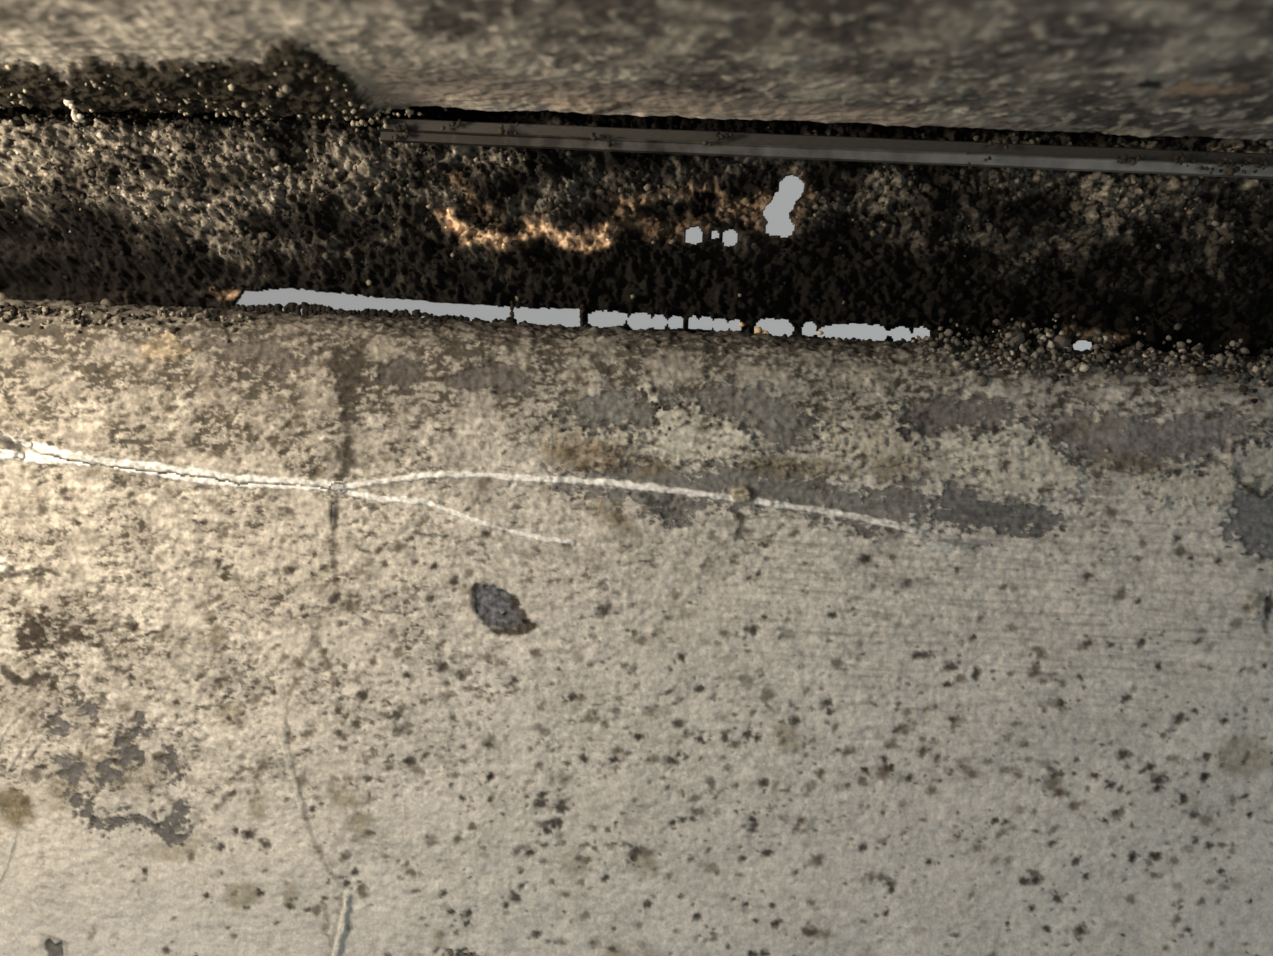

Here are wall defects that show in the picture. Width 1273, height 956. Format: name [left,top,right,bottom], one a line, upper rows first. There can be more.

damp [445,96,750,120]
crack [0,345,986,552]
crack [332,893,349,956]